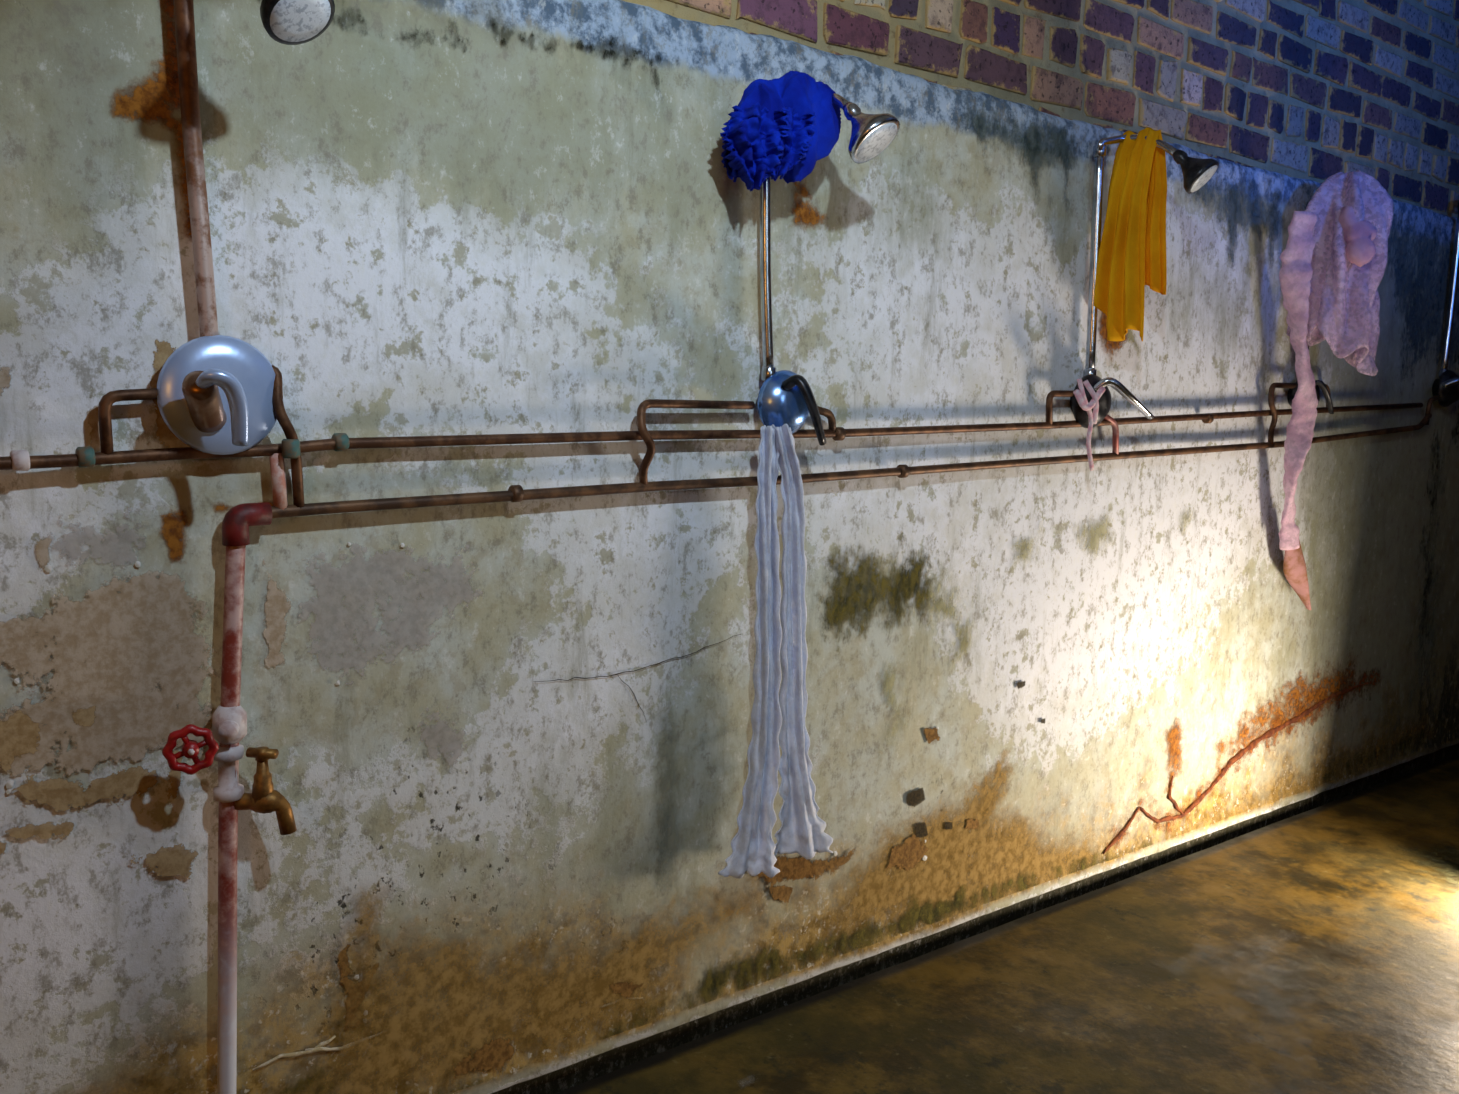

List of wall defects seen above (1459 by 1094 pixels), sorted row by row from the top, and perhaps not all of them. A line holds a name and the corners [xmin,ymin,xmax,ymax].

rust [111,0,192,239]
rust [161,510,187,561]
leakage [825,596,850,651]
peeling [0,570,216,855]
rust [1139,661,1380,832]
peeling [131,843,198,879]
leakage [850,751,1094,933]
leakage [286,900,746,1094]
leakage [704,946,780,990]